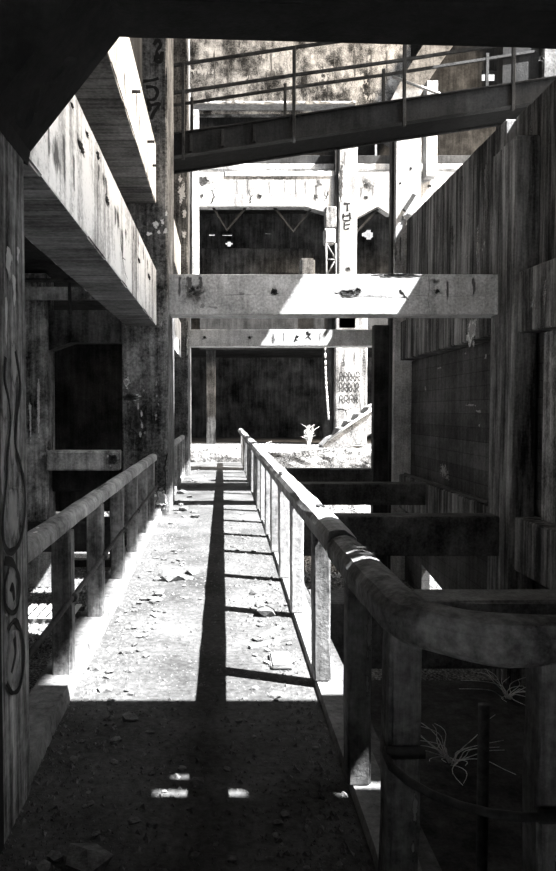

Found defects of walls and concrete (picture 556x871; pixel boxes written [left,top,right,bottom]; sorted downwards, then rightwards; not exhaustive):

leakage [48,129,75,186]
leakage [115,209,148,264]
peeling [5,246,20,346]
spalling [336,287,361,297]